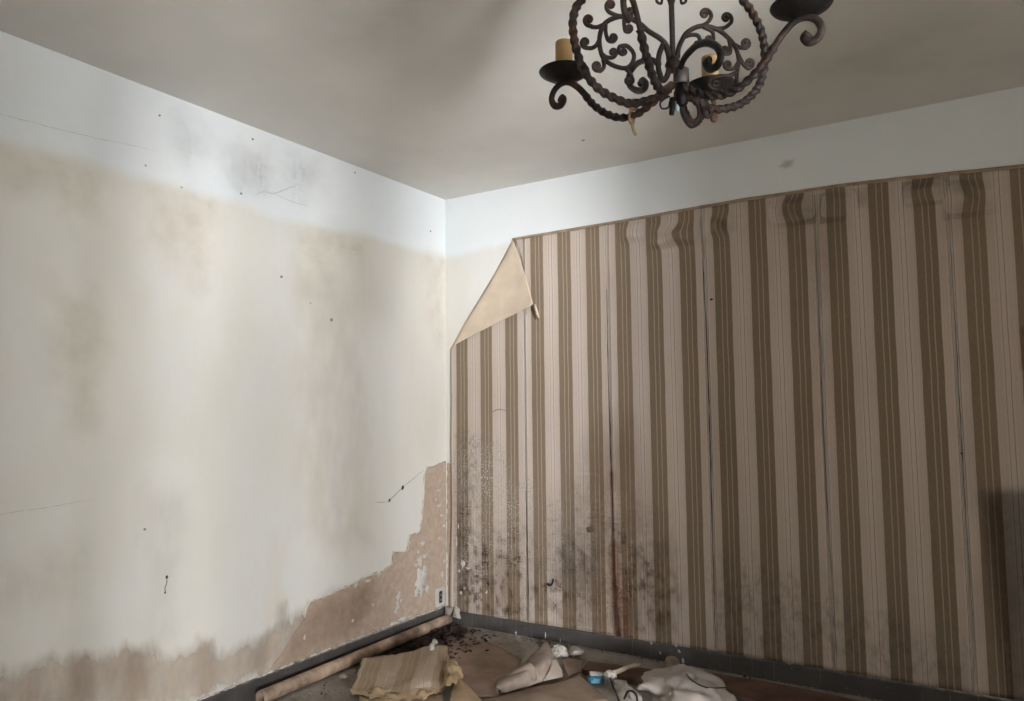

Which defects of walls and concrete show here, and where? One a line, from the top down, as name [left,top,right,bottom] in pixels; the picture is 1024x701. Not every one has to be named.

peeling [453,240,533,346]
peeling [270,462,451,671]
water stain [455,443,596,614]
water stain [0,617,305,701]